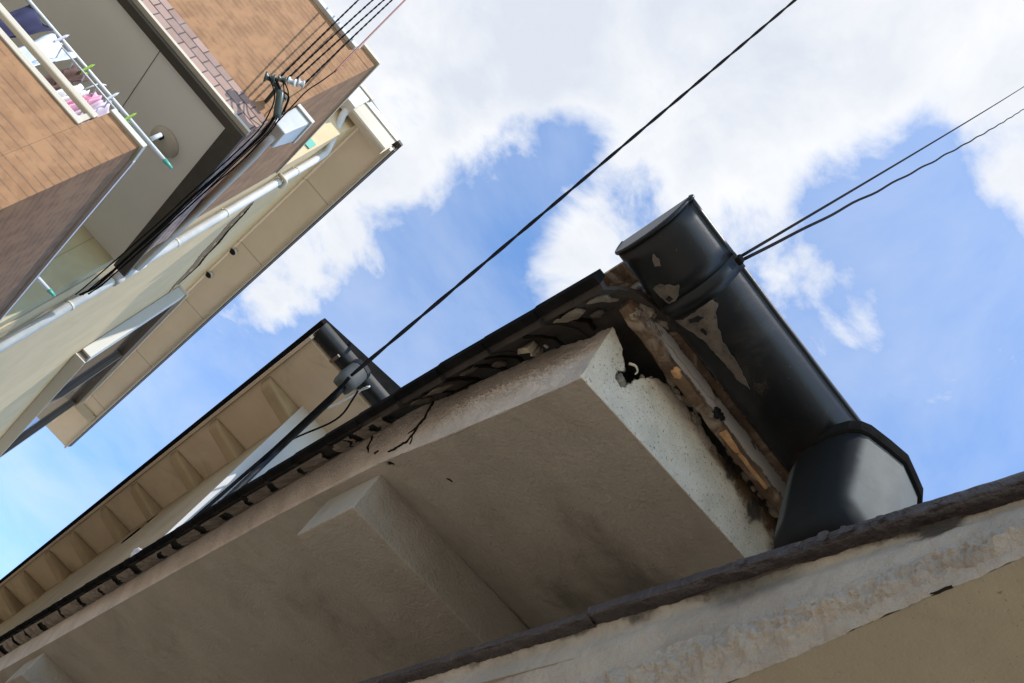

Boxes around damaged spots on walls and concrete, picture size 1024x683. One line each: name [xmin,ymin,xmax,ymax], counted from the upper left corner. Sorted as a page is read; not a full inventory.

peeling [629,284,750,389]
spalling [615,362,702,425]
crack [343,401,434,454]